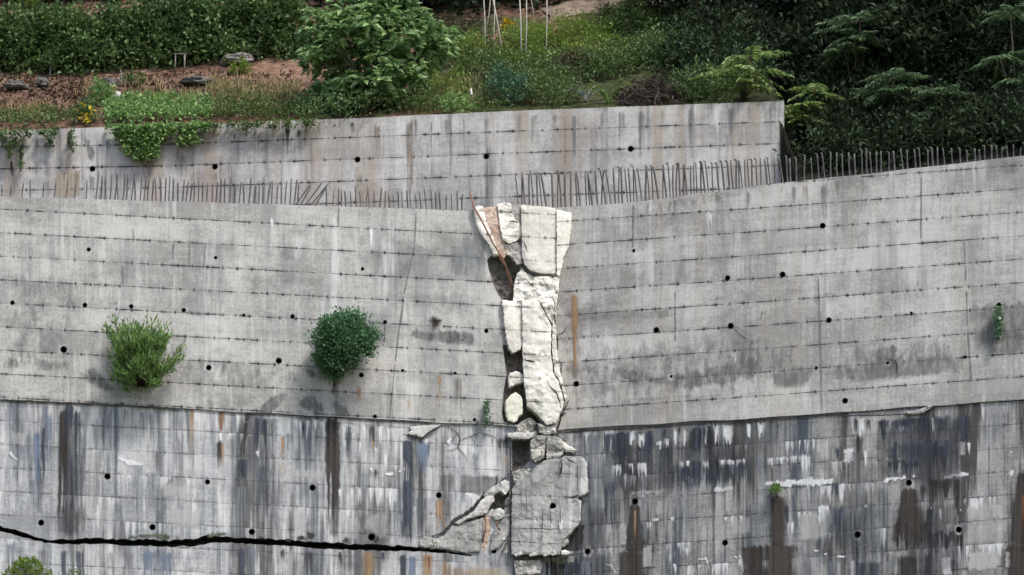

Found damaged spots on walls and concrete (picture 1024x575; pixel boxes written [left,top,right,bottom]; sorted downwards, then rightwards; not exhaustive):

peeling [1,142,1024,575]
leakage [13,404,87,531]
leakage [62,551,83,575]
leakage [143,551,171,575]
crack [0,413,584,559]
leakage [237,381,499,563]
leakage [400,555,416,575]
leakage [546,426,844,575]
leakage [788,495,880,575]
leakage [836,412,1024,575]